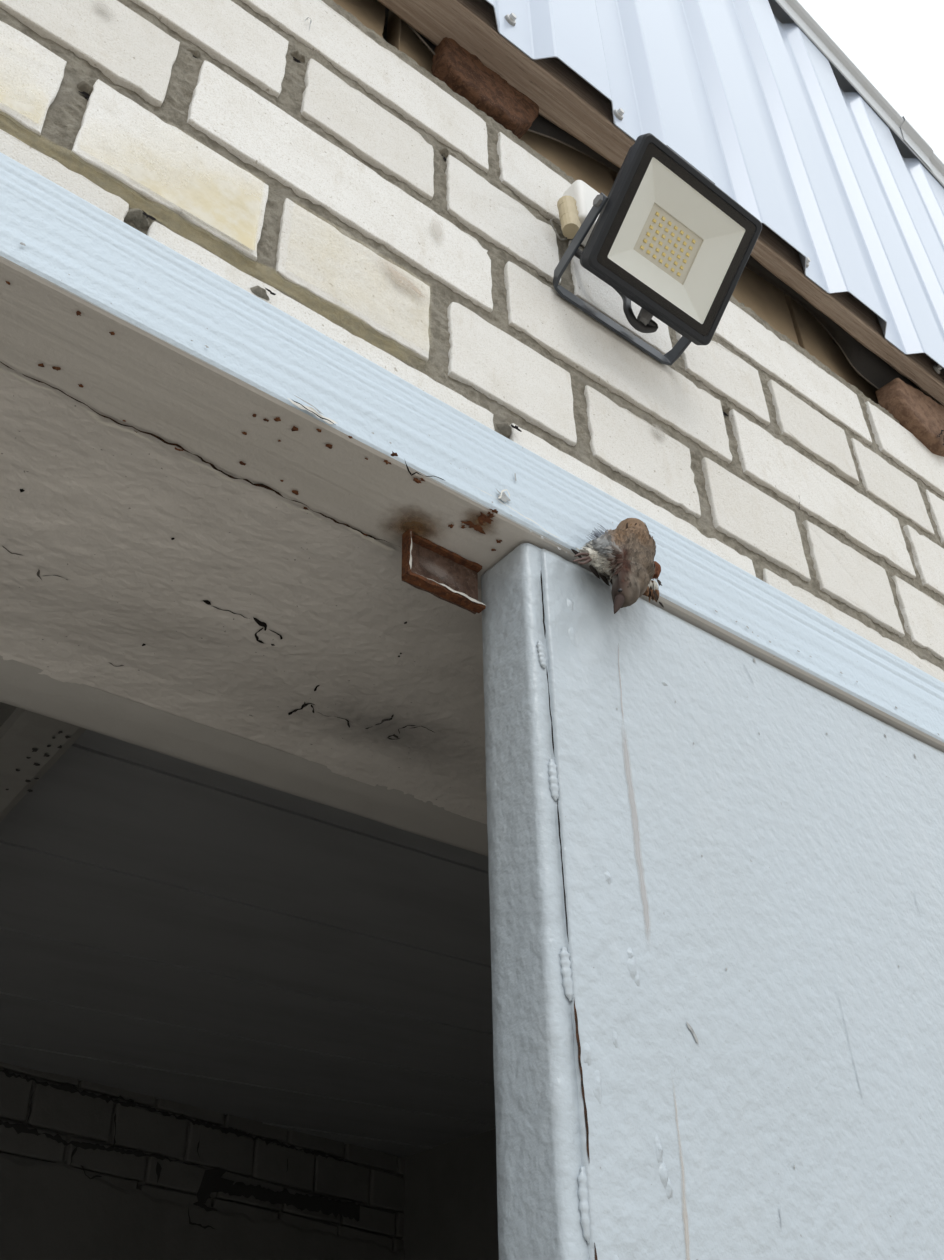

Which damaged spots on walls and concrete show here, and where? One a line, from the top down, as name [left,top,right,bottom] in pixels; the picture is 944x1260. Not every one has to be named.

crack [0,362,400,551]
crack [383,451,445,484]
corrosion [448,509,502,551]
crack [203,600,283,646]
crack [288,685,435,740]